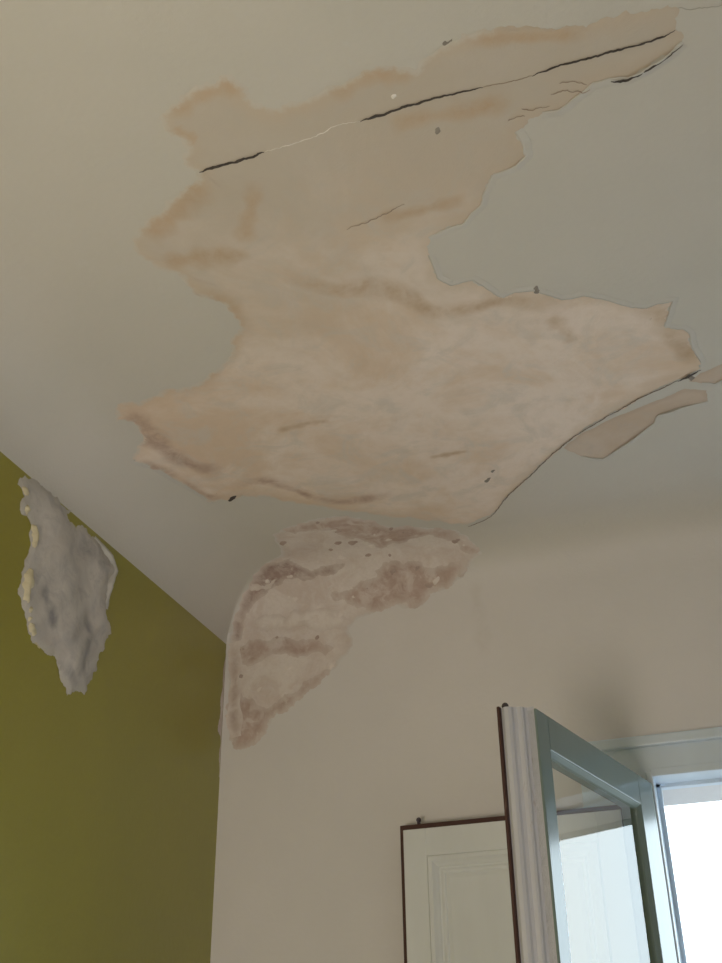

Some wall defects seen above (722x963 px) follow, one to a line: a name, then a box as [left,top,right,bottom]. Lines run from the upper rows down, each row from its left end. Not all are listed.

crack [199,30,675,173]
leakage [139,172,587,401]
peeling [114,5,722,525]
peeling [18,476,118,695]
leakage [115,403,482,750]